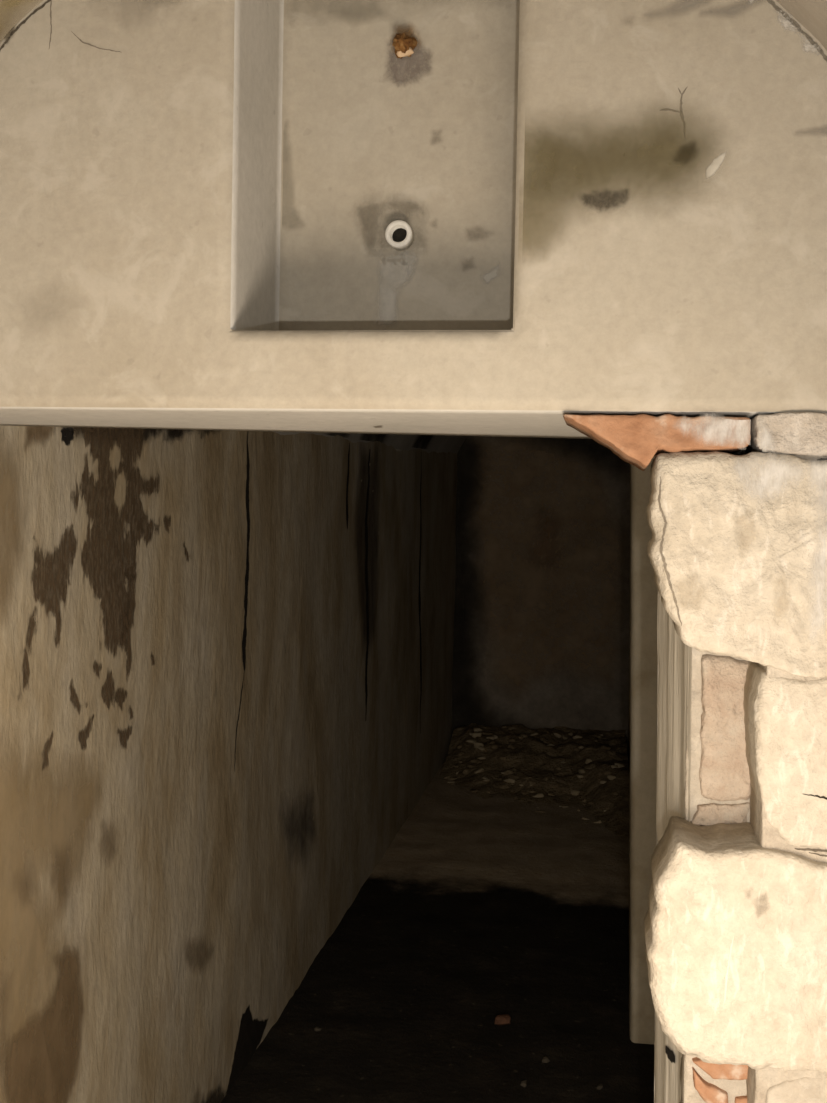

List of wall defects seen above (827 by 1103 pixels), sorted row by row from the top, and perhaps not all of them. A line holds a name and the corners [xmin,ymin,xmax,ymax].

corrosion [388,28,429,82]
damp [523,121,699,231]
damp [361,204,416,324]
peeling [19,427,171,749]
crack [795,848,827,857]